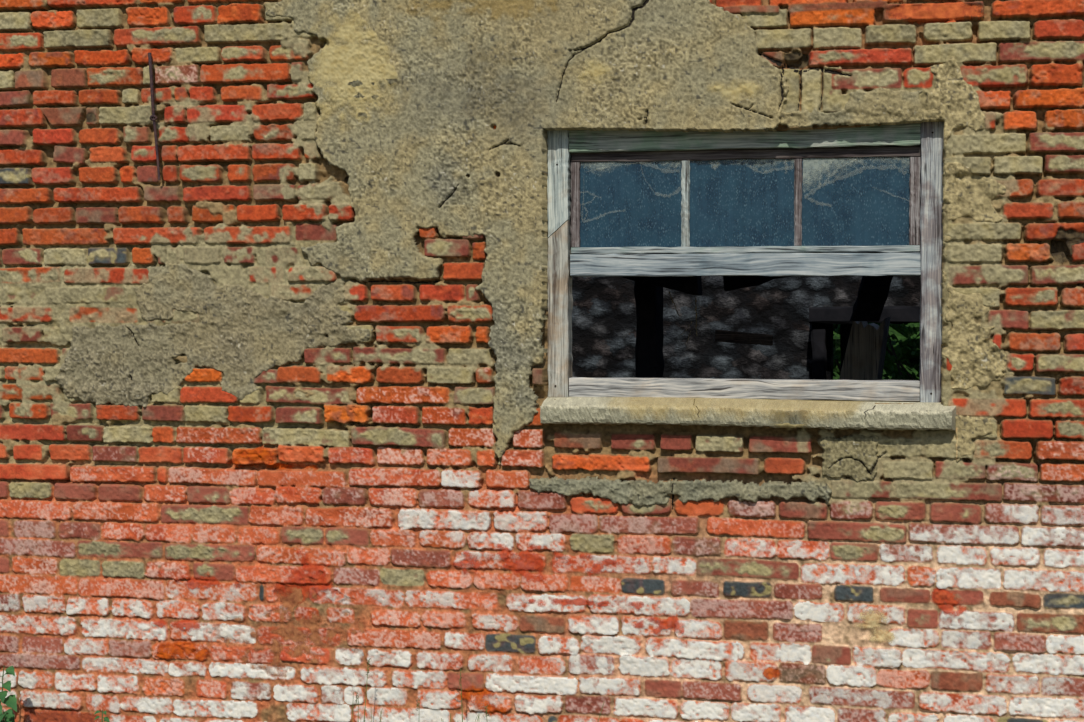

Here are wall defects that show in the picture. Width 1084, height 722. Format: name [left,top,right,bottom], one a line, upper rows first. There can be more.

crack [556,0,649,102]
crack [732,53,851,118]
peeling [55,0,985,465]
spalling [1051,228,1084,263]
peeling [942,271,1007,390]
peeling [529,435,879,507]
crack [828,453,885,474]
damp [273,551,340,603]
damp [453,544,544,581]
damp [528,598,614,607]
damp [630,602,684,634]
damp [931,588,966,616]